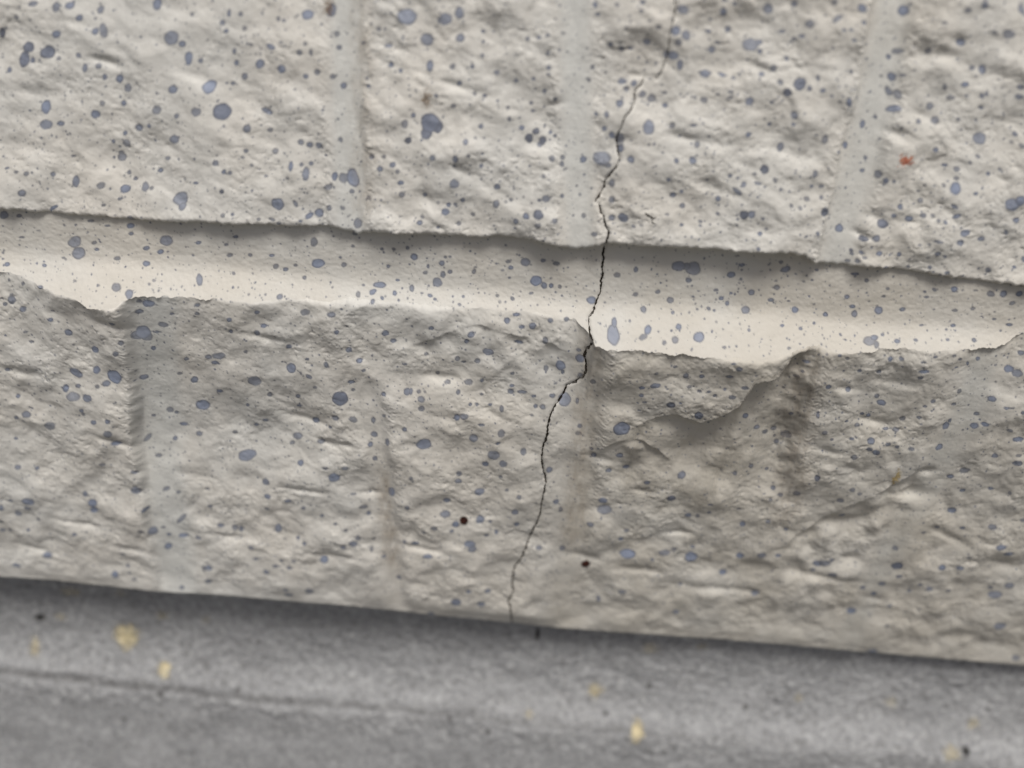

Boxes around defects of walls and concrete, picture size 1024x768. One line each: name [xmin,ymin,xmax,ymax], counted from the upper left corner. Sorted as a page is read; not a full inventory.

crack [507,0,676,622]
spalling [626,345,818,501]